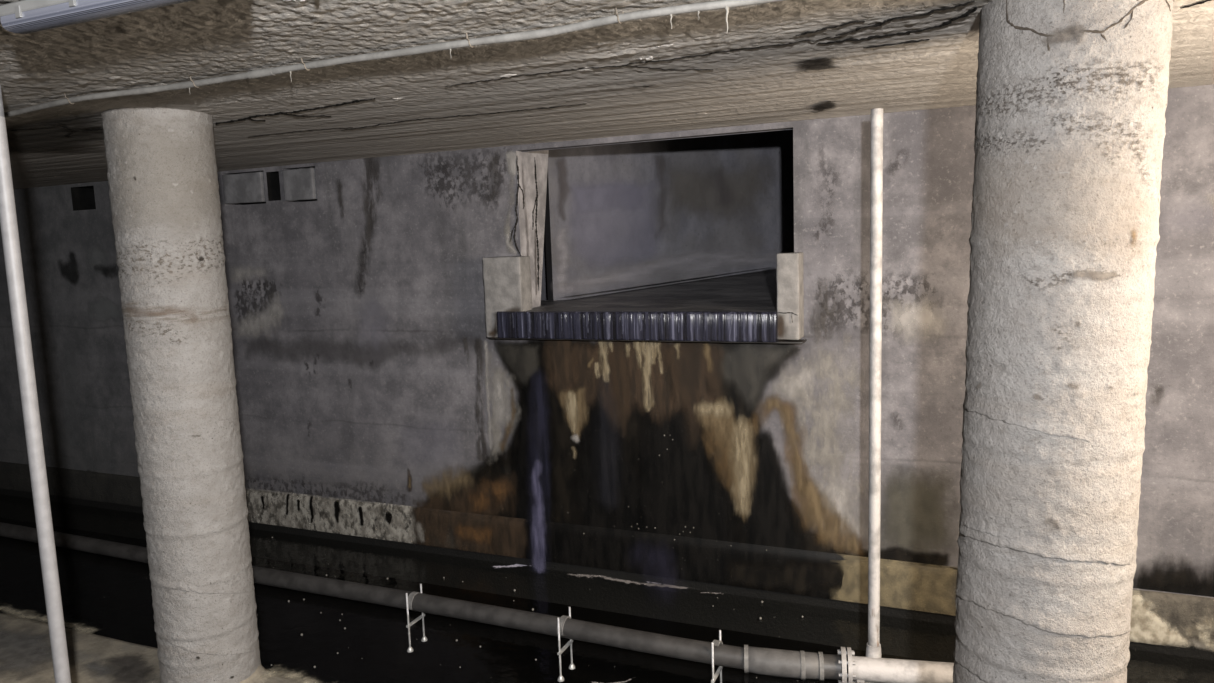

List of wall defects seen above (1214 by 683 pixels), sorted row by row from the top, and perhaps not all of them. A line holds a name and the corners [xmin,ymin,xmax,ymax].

crack [446,0,1212,87]
crack [215,98,583,137]
damp [359,157,379,292]
damp [424,156,506,203]
crack [510,157,539,289]
damp [235,269,282,333]
corrosion [548,340,722,430]
damp [440,315,956,616]
corrosion [408,470,527,558]
damp [1135,563,1214,597]